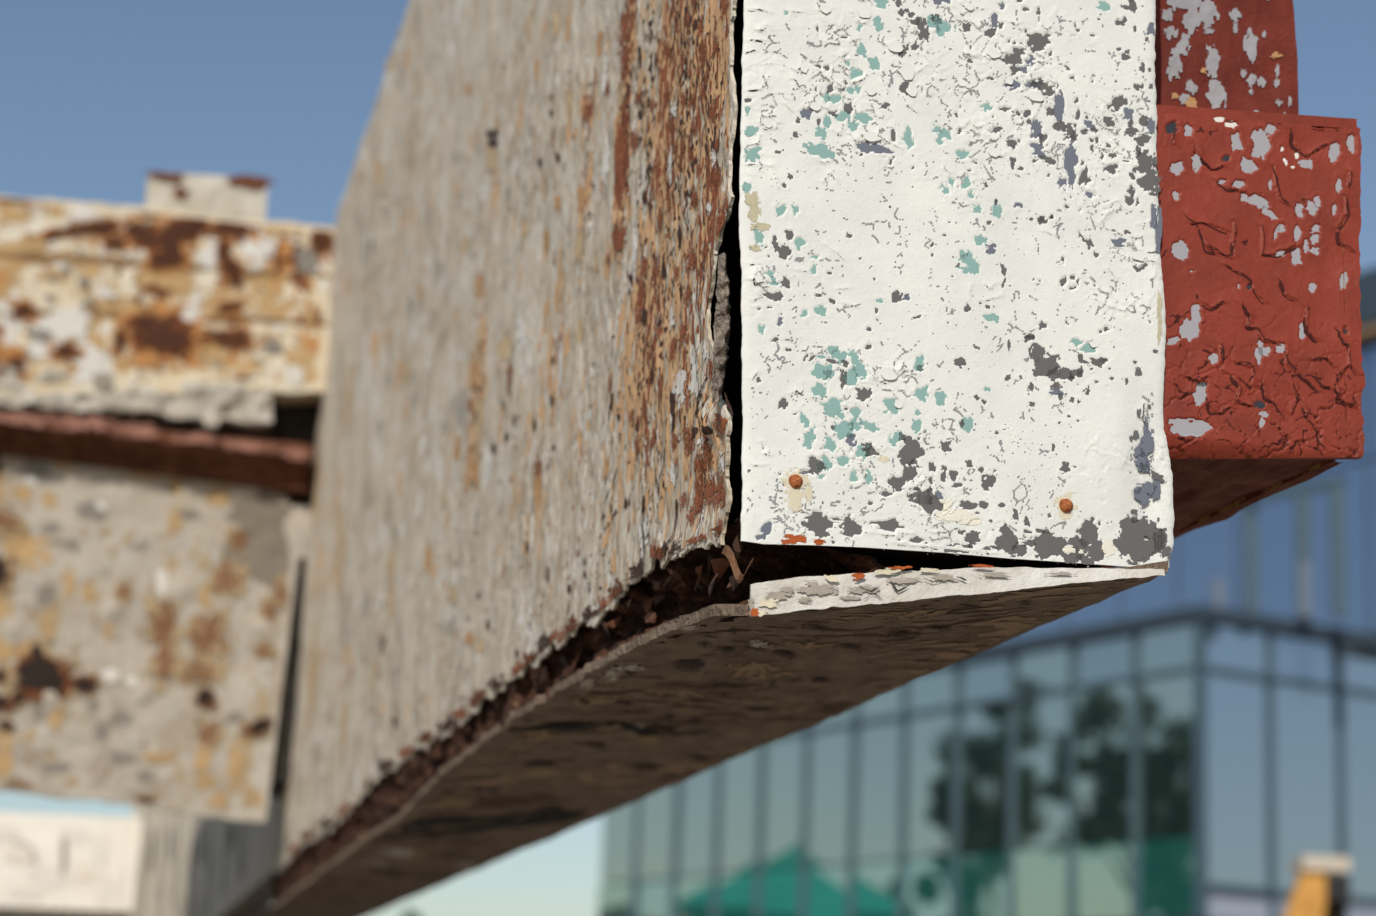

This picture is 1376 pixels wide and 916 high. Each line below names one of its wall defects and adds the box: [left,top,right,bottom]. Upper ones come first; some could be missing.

peeling [879,0,942,109]
peeling [962,2,1070,84]
rust [581,0,729,245]
peeling [988,53,1163,206]
rust [7,297,41,324]
rust [0,337,87,388]
crack [669,372,757,439]
peeling [1022,321,1110,395]
rust [376,246,728,773]
peeling [801,511,925,543]
peeling [879,431,1174,565]
rust [112,526,288,750]